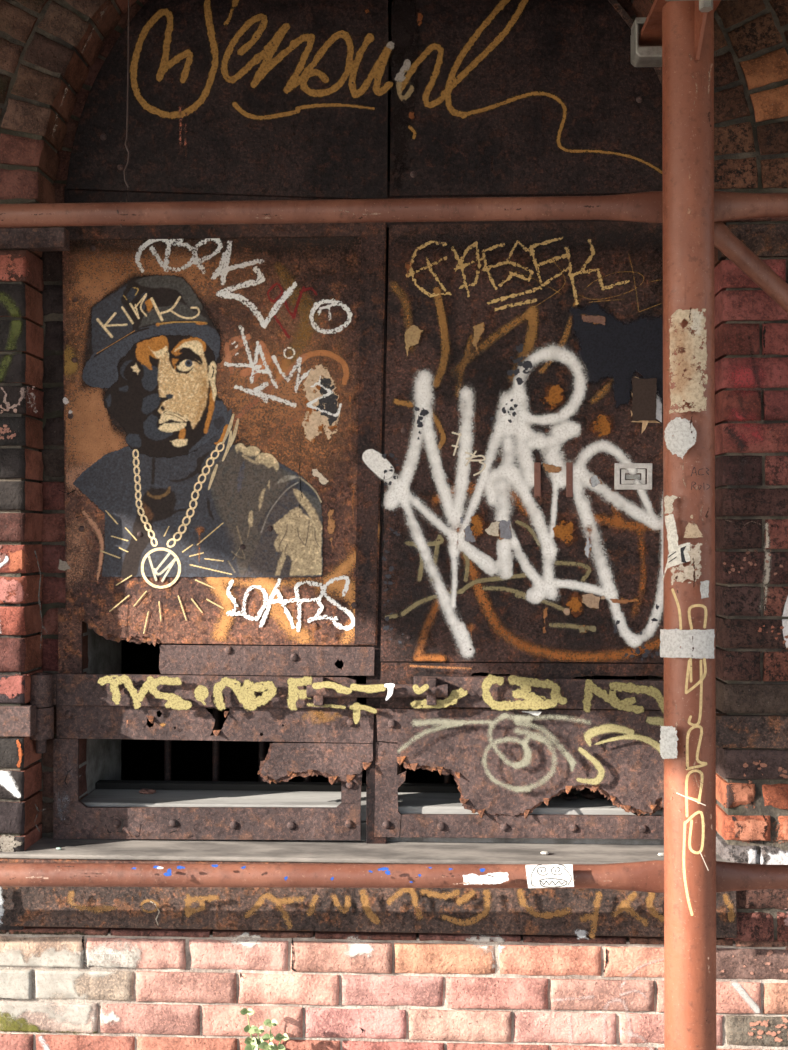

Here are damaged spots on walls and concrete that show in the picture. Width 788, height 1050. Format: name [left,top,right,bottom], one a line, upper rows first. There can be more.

corrosion [64,242,355,495]
corrosion [394,398,413,407]
corrosion [433,287,539,397]
corrosion [540,384,565,409]
corrosion [590,379,613,437]
corrosion [431,482,477,505]
corrosion [507,488,531,516]
corrosion [66,510,105,582]
corrosion [206,544,356,645]
corrosion [409,587,471,669]
corrosion [455,514,661,662]
corrosion [553,490,660,615]